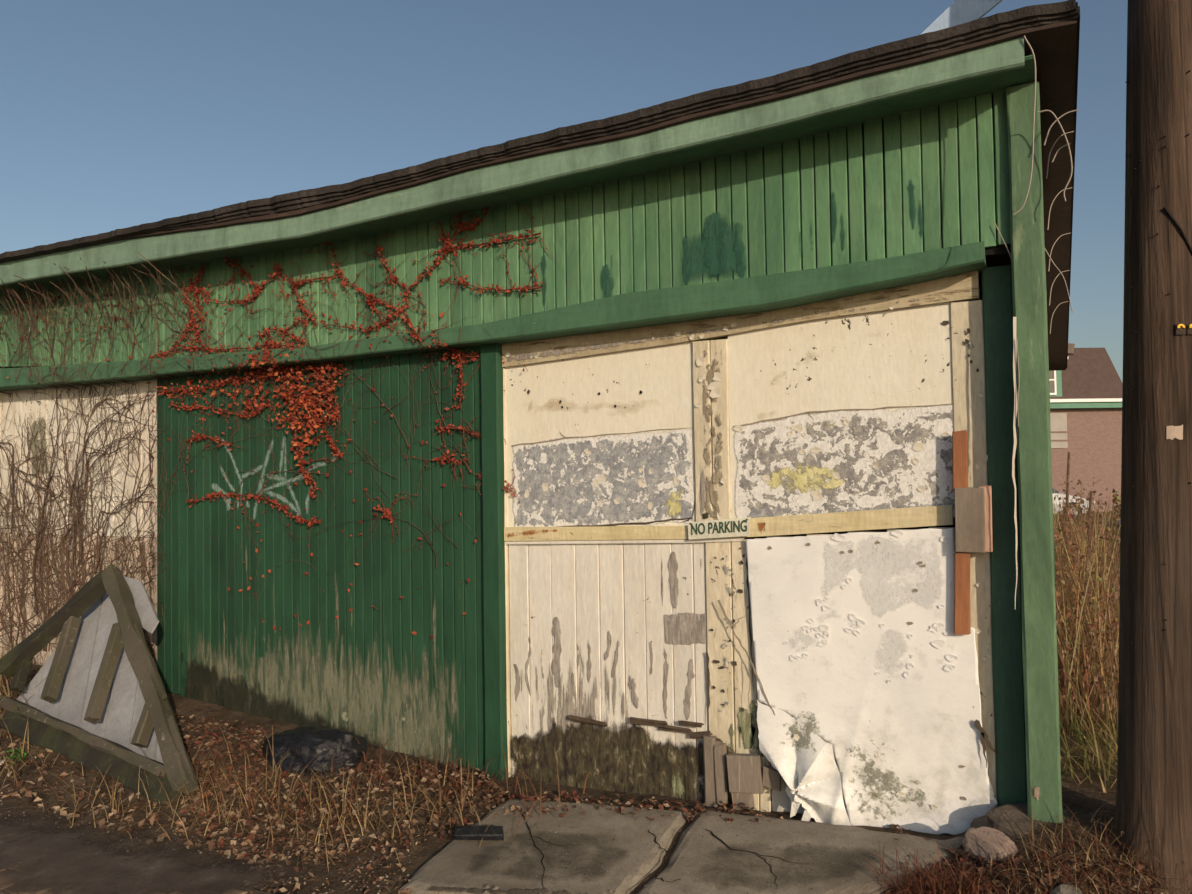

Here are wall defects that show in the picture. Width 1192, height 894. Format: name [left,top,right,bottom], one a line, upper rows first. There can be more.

peeling [505,323,955,527]
leakage [181,654,385,749]
crack [520,808,580,889]
crack [631,828,802,894]